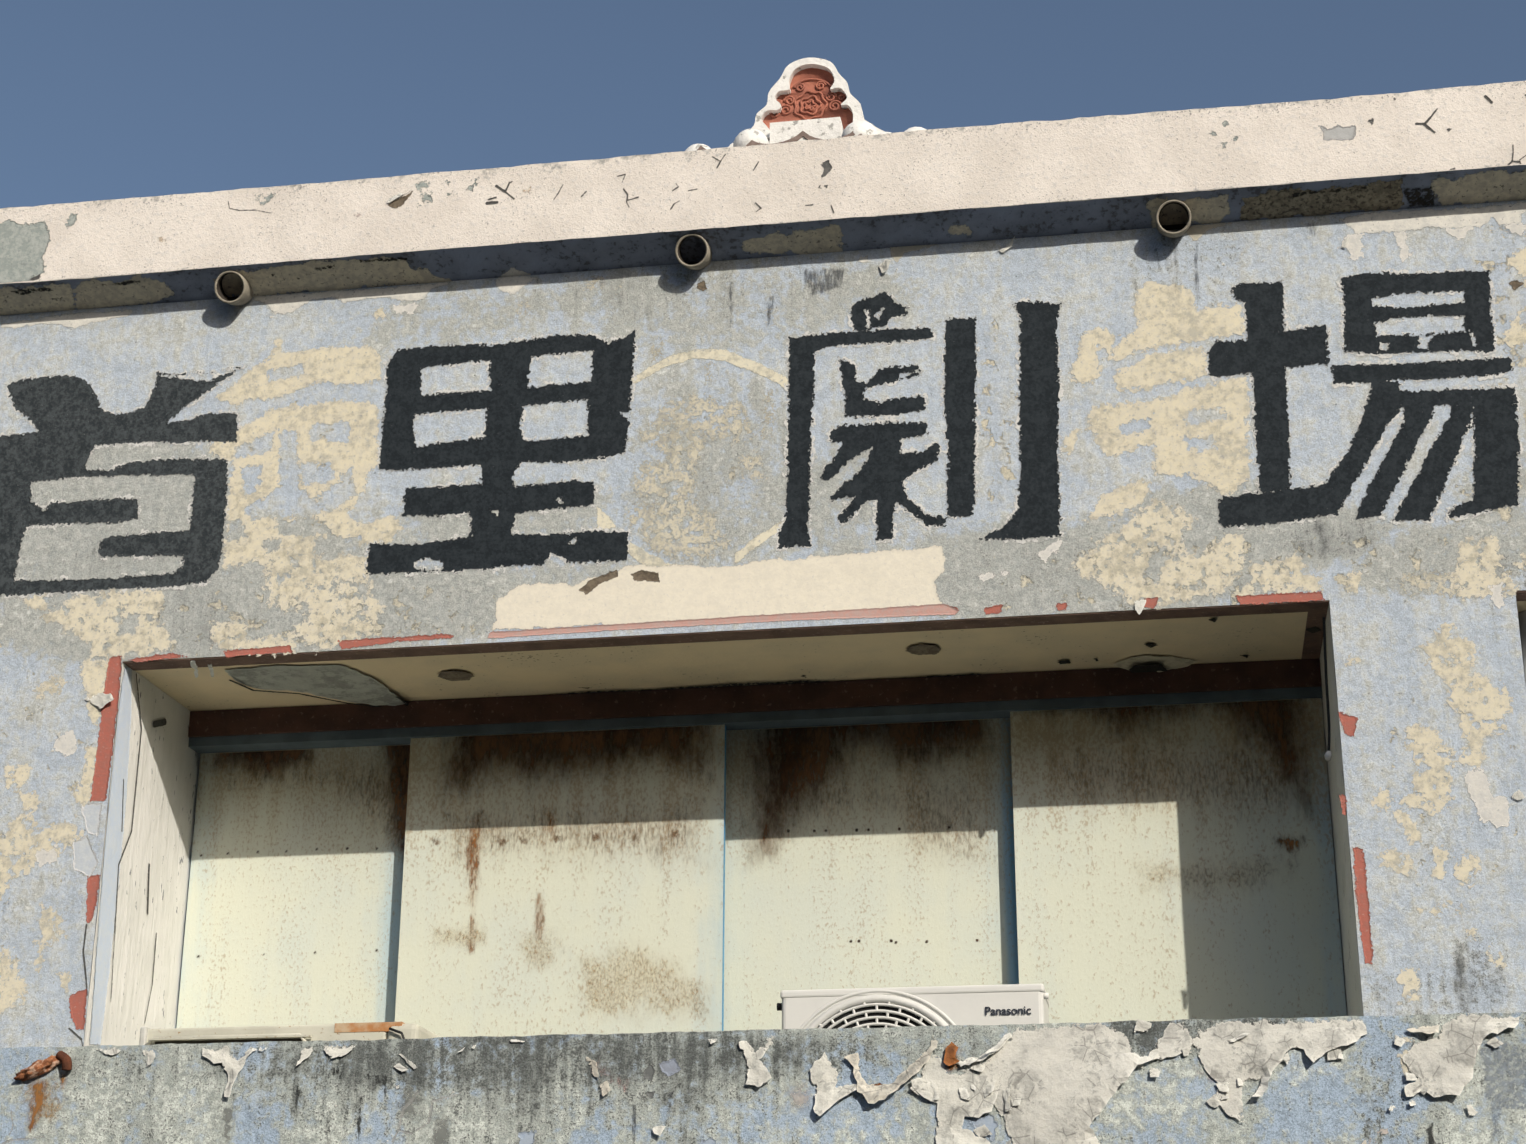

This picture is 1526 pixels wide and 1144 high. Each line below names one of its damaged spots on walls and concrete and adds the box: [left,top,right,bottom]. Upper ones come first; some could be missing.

peeling [0,213,174,329]
peeling [1146,169,1526,290]
peeling [1036,281,1325,615]
peeling [0,338,453,1055]
peeling [1353,622,1525,969]
corrosion [26,1074,65,1131]
peeling [202,1045,266,1097]
peeling [296,1045,355,1066]
leakage [367,1074,421,1118]
leakage [432,1105,454,1144]
peeling [810,1019,1367,1144]
peeling [1389,1013,1520,1116]